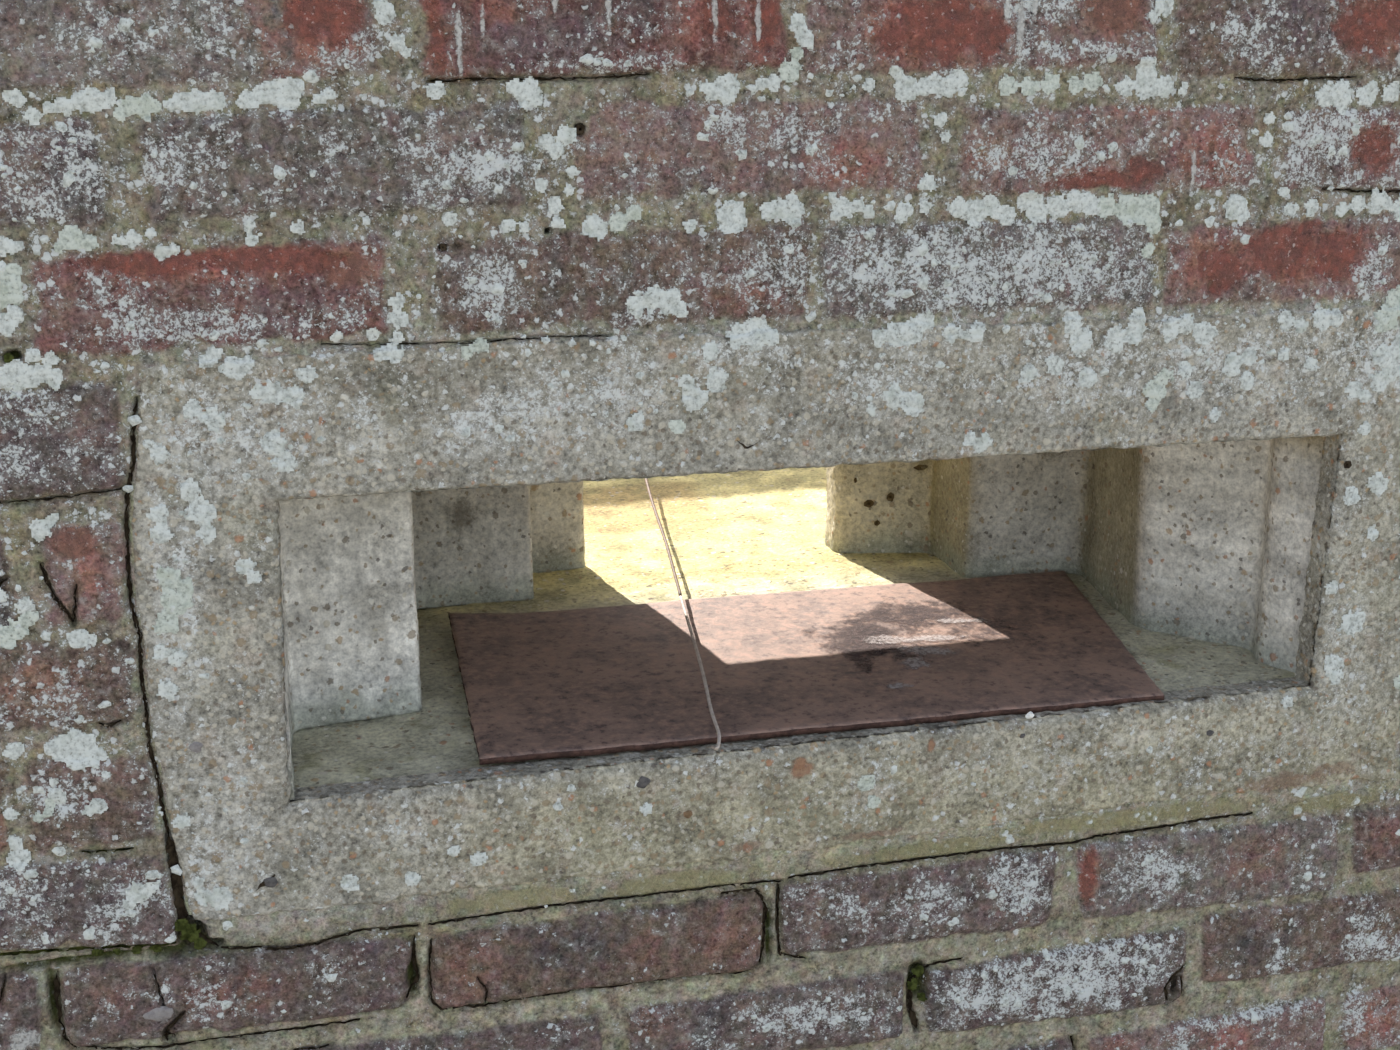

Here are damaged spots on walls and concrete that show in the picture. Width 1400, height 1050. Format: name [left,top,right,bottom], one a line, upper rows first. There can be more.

crack [0,398,1253,1050]